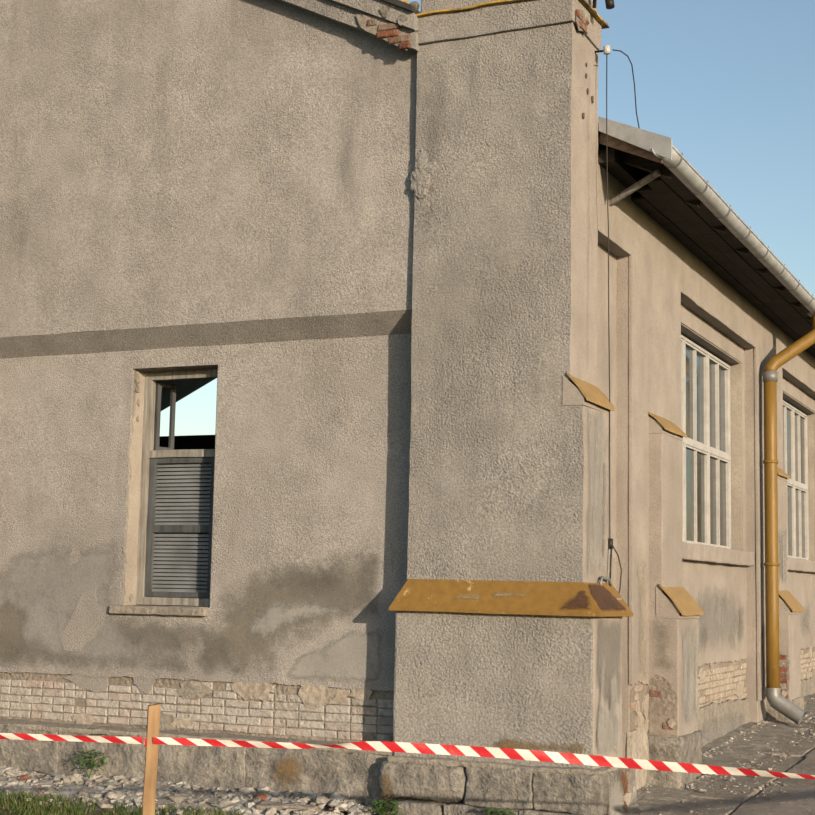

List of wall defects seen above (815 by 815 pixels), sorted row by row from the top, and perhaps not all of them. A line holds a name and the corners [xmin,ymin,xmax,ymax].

flaking render [356,0,420,50]
flaking render [576,9,590,34]
peeling [609,555,617,589]
rust [562,585,626,610]
flaking render [0,674,394,742]
leakage [598,621,621,751]
flaking render [630,674,678,736]
flaking render [697,662,747,708]
flaking render [779,652,790,700]